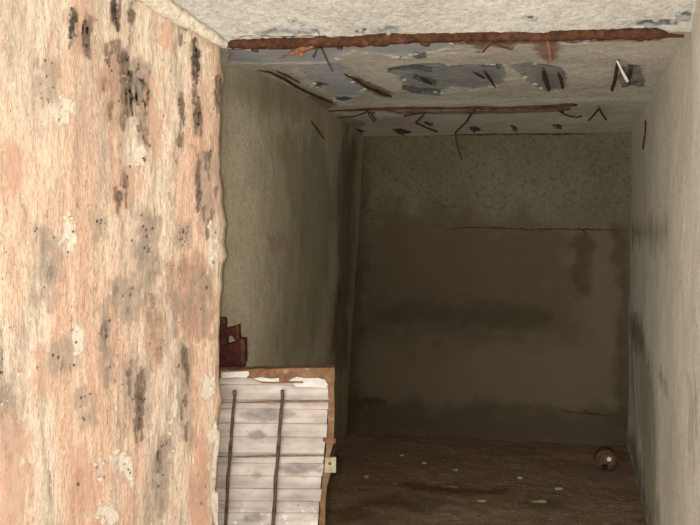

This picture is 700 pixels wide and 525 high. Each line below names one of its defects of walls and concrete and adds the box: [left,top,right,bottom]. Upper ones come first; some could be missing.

damp [67,7,92,59]
damp [104,0,161,153]
damp [159,24,203,147]
damp [214,76,222,113]
spalling [227,11,691,114]
damp [113,165,133,217]
damp [194,149,219,239]
crack [450,226,623,234]
damp [98,210,162,374]
damp [123,360,149,442]
damp [175,342,194,443]